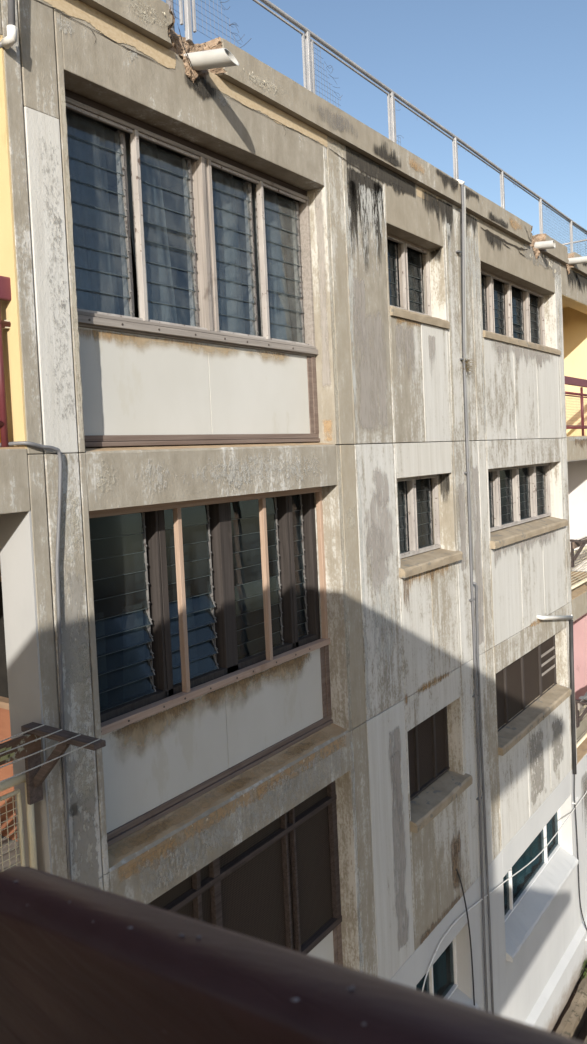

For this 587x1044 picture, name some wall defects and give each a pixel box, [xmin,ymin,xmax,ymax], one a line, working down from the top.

crack [36,0,159,64]
crack [226,96,382,181]
peeling [44,0,346,439]
water stain [346,144,508,264]
peeling [346,185,386,431]